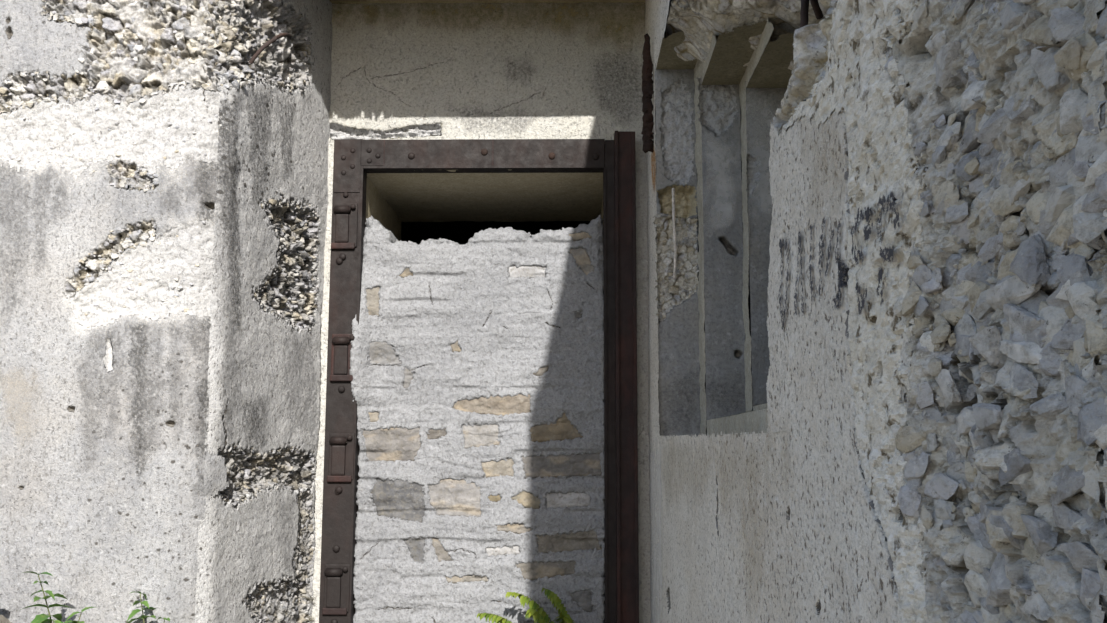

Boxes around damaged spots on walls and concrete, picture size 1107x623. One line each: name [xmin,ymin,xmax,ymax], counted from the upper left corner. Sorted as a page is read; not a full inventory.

spalling [0,0,321,332]
corrosion [641,33,656,188]
peeling [62,206,227,372]
spalling [653,0,1107,623]
leakage [109,325,159,475]
leakage [197,372,209,483]
spalling [218,443,316,623]